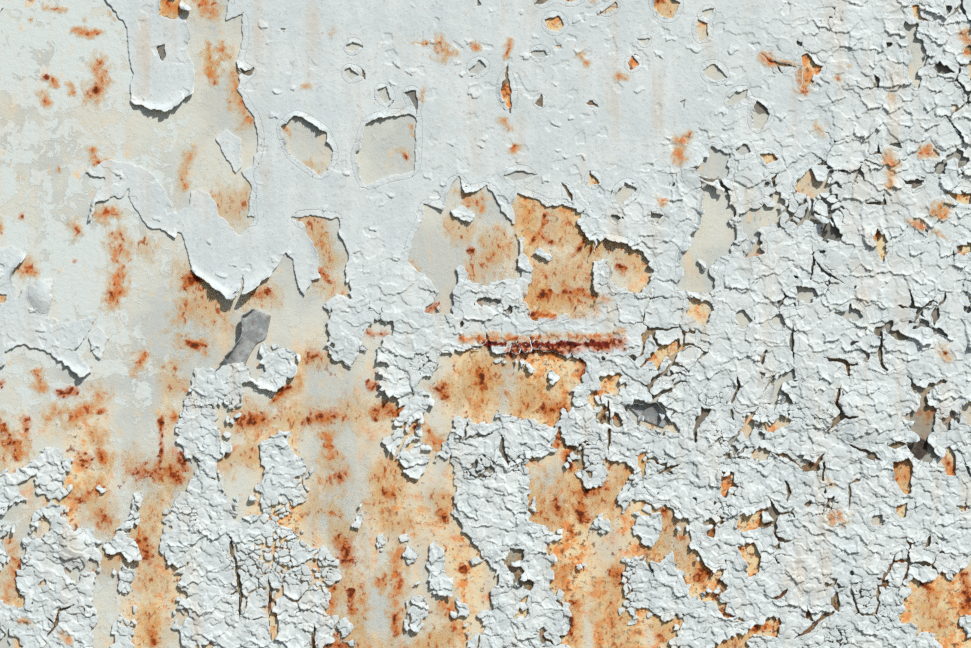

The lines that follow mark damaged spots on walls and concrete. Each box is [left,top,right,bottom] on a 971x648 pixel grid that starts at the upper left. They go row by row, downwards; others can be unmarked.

rust [30,368,190,593]
peeling [0,0,264,648]
peeling [159,208,784,648]
rust [430,327,625,423]
peeling [404,165,658,325]
rust [443,202,649,319]
peeling [628,140,849,377]
crack [758,326,908,522]
crack [909,293,948,333]
rust [304,509,461,648]
crack [771,588,842,648]
crack [855,549,908,613]